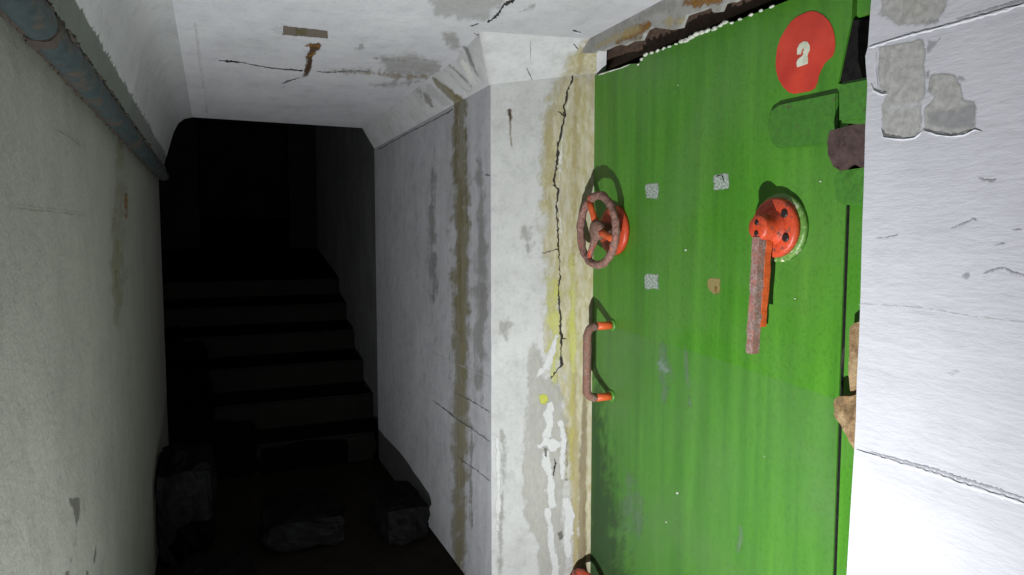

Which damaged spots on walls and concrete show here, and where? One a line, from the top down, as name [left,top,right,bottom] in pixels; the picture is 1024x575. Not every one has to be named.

crack [220,60,367,84]
corrosion [298,30,321,77]
crack [472,0,515,36]
peeling [599,5,775,75]
peeling [881,0,946,25]
peeling [871,40,980,141]
crack [544,76,573,379]
water stain [365,58,485,570]
water stain [541,41,596,573]
peeling [522,335,575,575]
peeling [69,499,80,525]